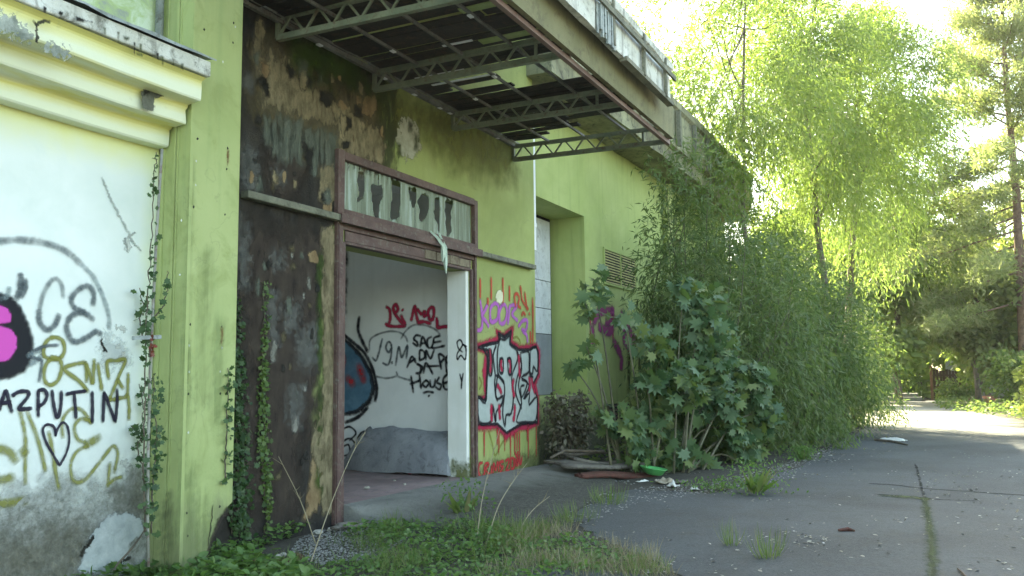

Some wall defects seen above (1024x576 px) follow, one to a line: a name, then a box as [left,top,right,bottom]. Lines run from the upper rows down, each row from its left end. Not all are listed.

peeling [245,18,422,212]
peeling [270,333,291,372]
peeling [287,226,335,520]
spalling [0,459,150,576]